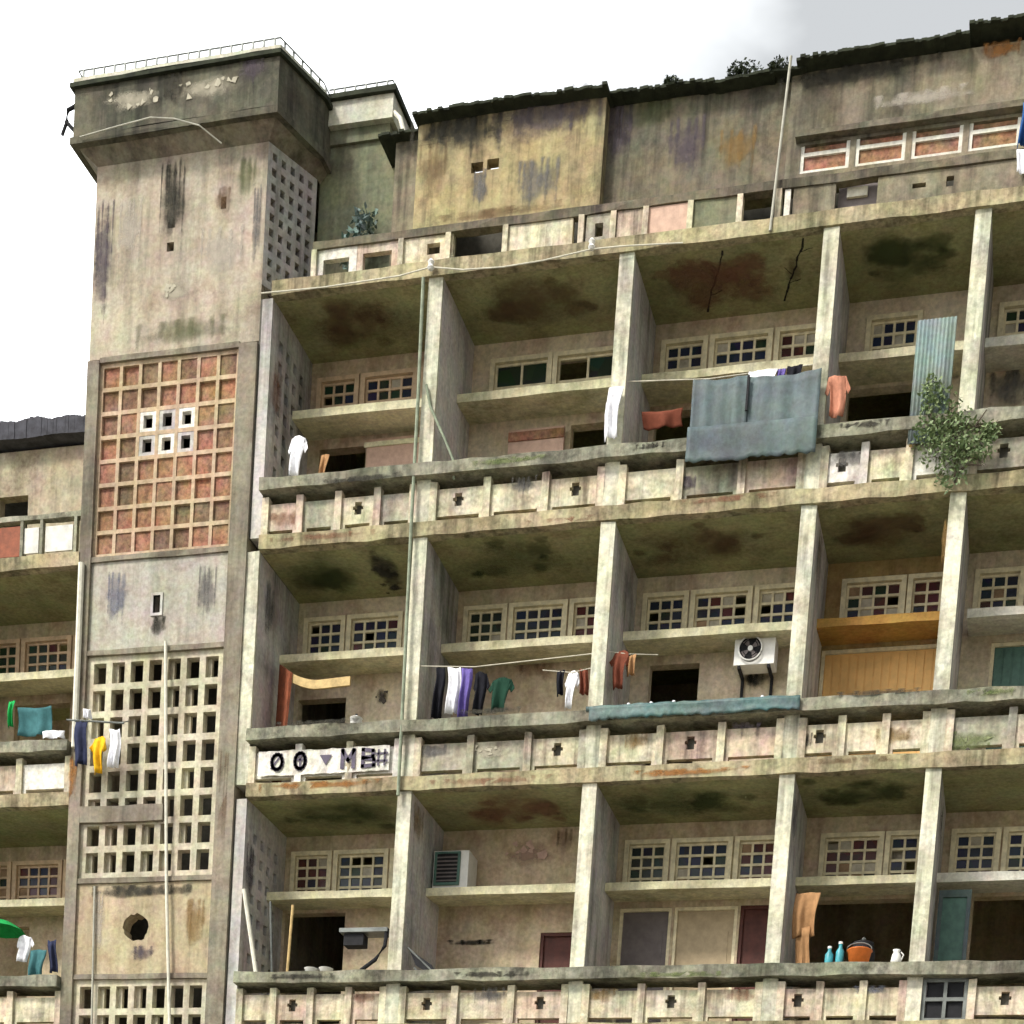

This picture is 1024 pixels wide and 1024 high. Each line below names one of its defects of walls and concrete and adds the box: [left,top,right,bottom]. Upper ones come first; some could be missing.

corrosion [985,38,1020,56]
peeling [108,88,159,110]
peeling [179,76,239,100]
water stain [160,160,185,231]
water stain [474,170,486,199]
water stain [519,157,560,199]
water stain [95,201,114,298]
crack [707,250,723,312]
crack [783,238,811,301]
water stain [108,573,124,614]
water stain [199,567,217,606]
corrosion [636,767,728,776]